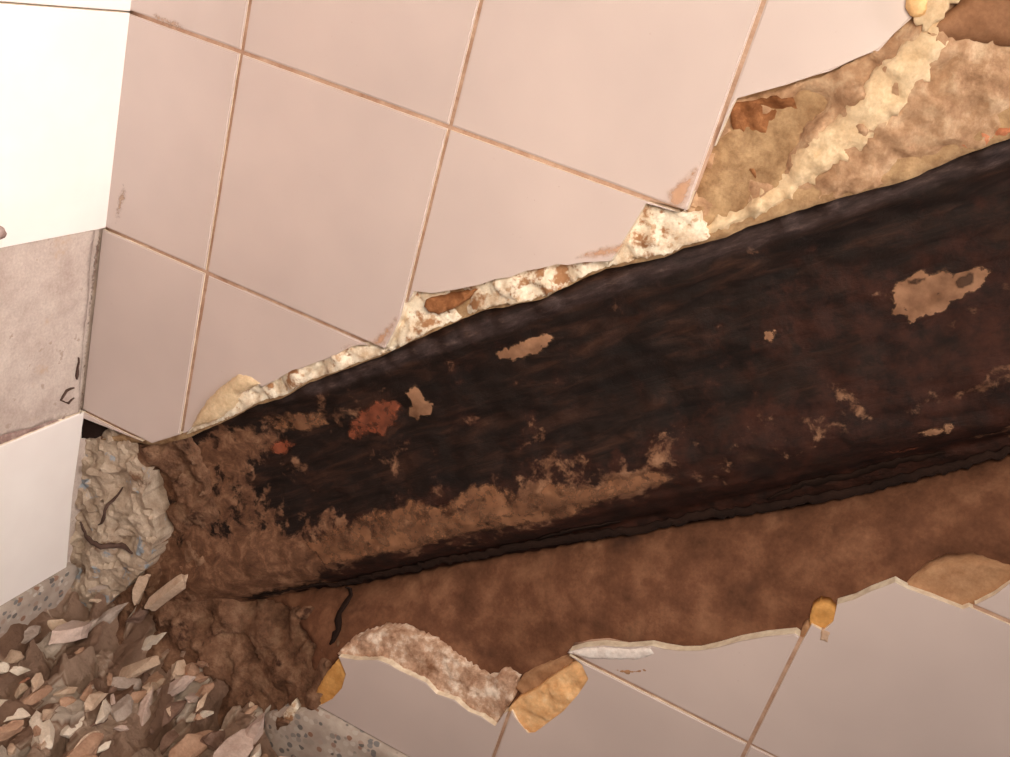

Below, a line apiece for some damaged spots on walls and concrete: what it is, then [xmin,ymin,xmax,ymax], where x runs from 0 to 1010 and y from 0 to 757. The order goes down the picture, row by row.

spalling [187,0,1010,434]
peeling [0,226,95,444]
crack [79,487,133,554]
rust [263,412,329,454]
rust [348,386,433,440]
spalling [70,419,1010,732]